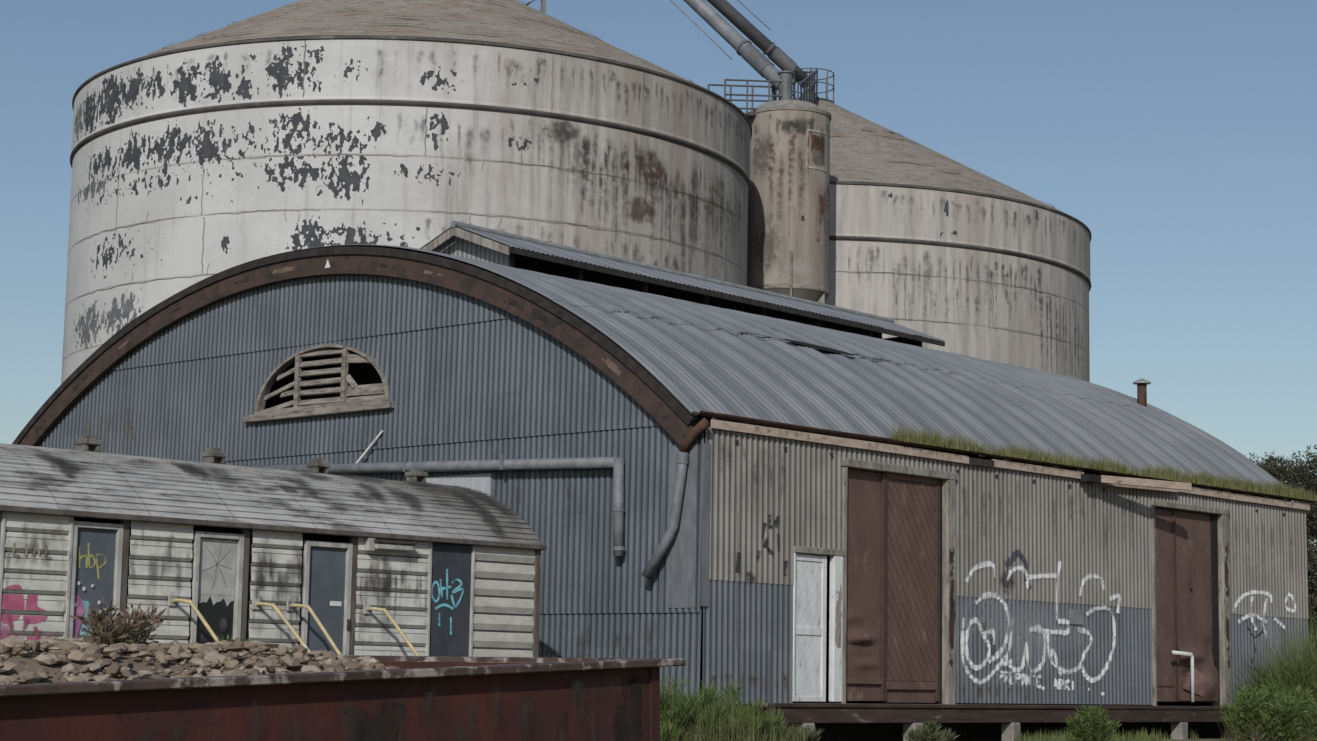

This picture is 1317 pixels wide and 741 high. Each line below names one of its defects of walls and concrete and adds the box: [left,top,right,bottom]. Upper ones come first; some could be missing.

peeling [74,41,386,210]
rust [770,136,809,199]
peeling [272,215,430,274]
peeling [74,229,162,350]
peeling [602,358,621,376]